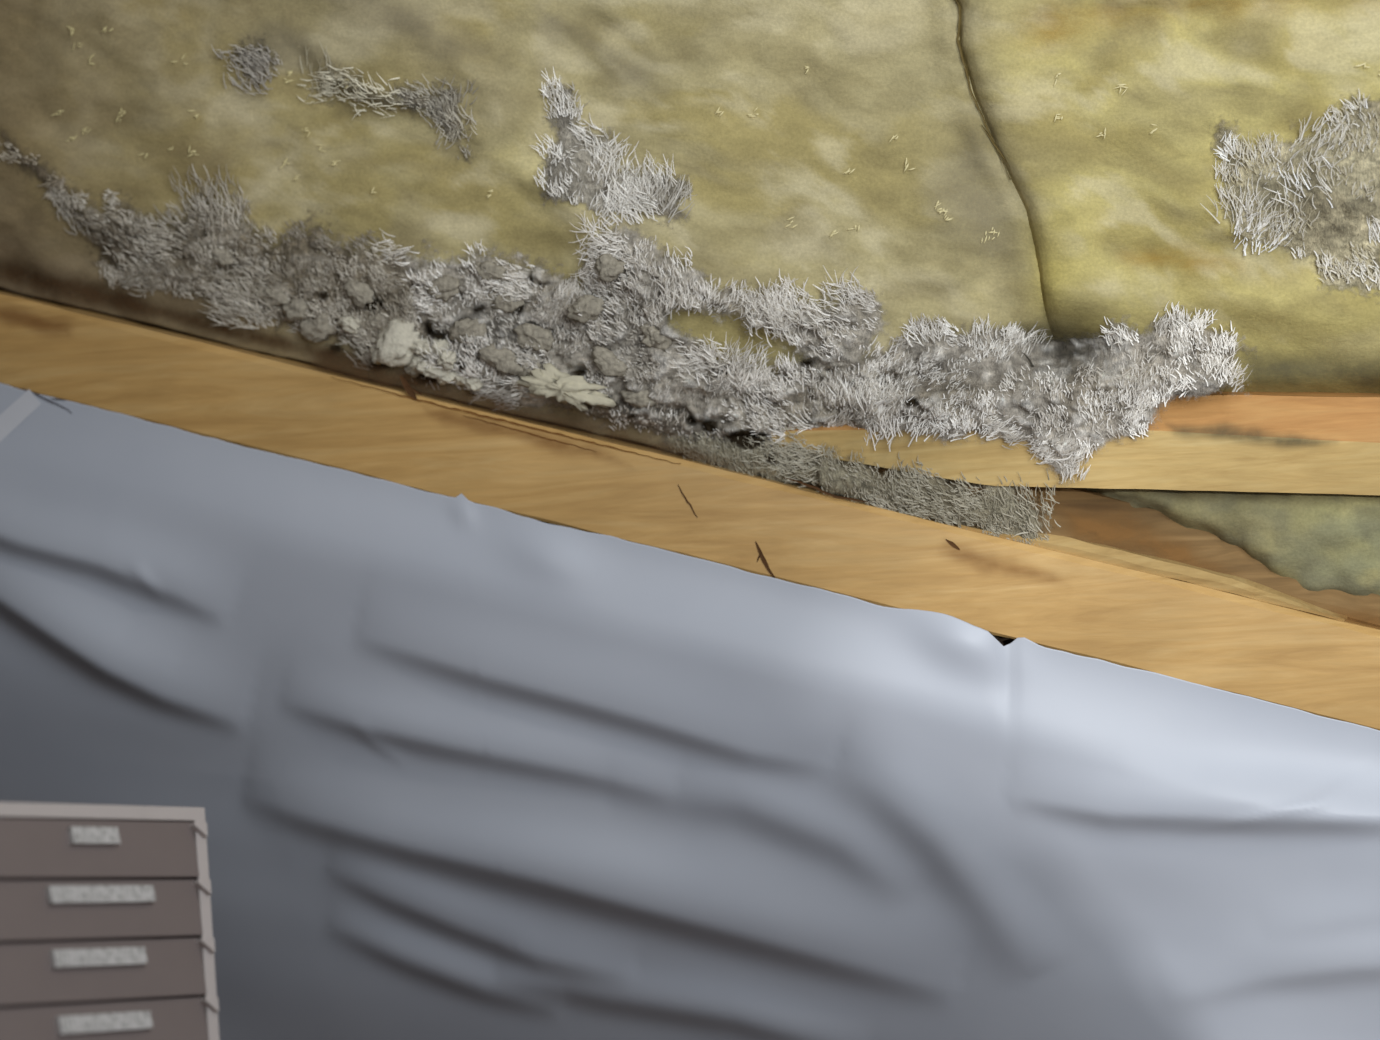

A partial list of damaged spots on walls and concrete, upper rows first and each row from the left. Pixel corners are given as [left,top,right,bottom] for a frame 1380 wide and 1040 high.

crack [956,0,1011,180]